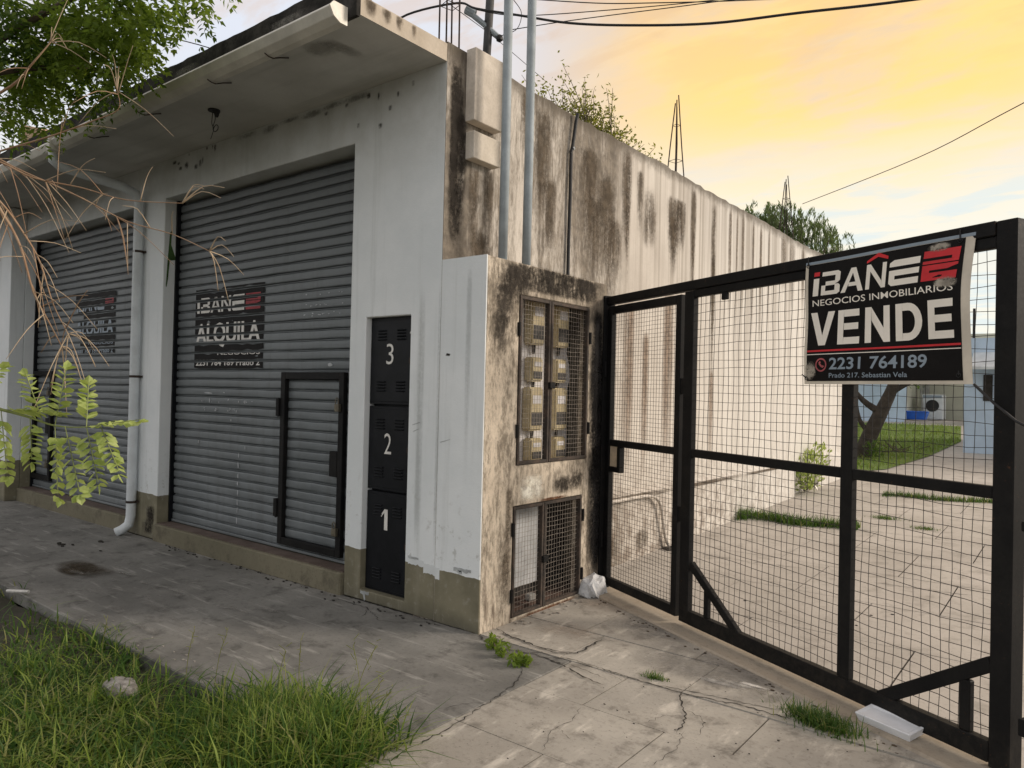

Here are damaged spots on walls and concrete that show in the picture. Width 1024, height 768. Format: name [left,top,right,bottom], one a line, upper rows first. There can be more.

water stain [449,68,493,255]
water stain [537,114,556,242]
water stain [584,150,655,266]
water stain [669,192,696,280]
water stain [729,214,804,272]
water stain [555,312,616,564]
water stain [506,477,542,540]
crack [339,595,790,764]